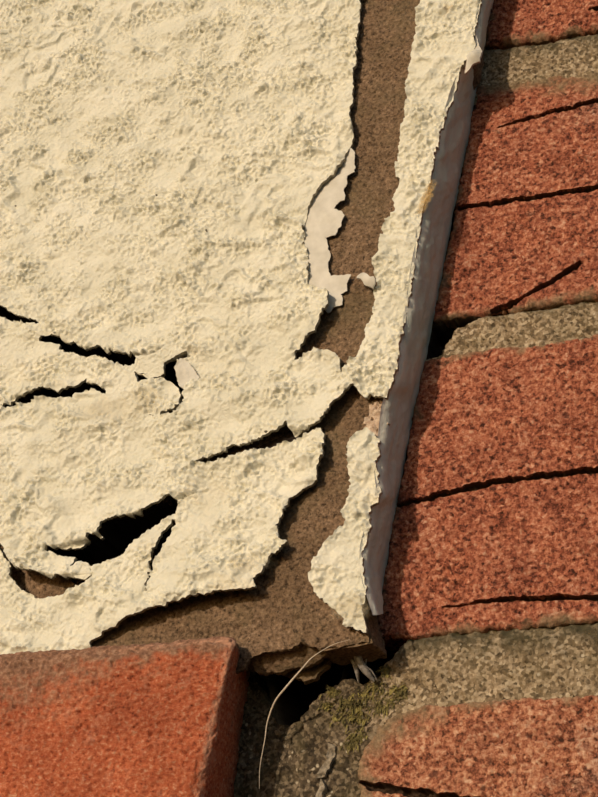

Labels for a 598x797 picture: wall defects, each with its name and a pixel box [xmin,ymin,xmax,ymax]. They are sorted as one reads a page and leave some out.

peeling [464,34,483,75]
crack [496,98,598,129]
peeling [296,0,420,370]
crack [453,184,598,215]
crack [490,260,583,316]
crack [0,306,200,414]
crack [256,430,296,449]
crack [397,466,598,507]
crack [0,496,178,599]
peeling [91,385,390,685]
crack [442,594,598,608]
crack [359,780,481,797]